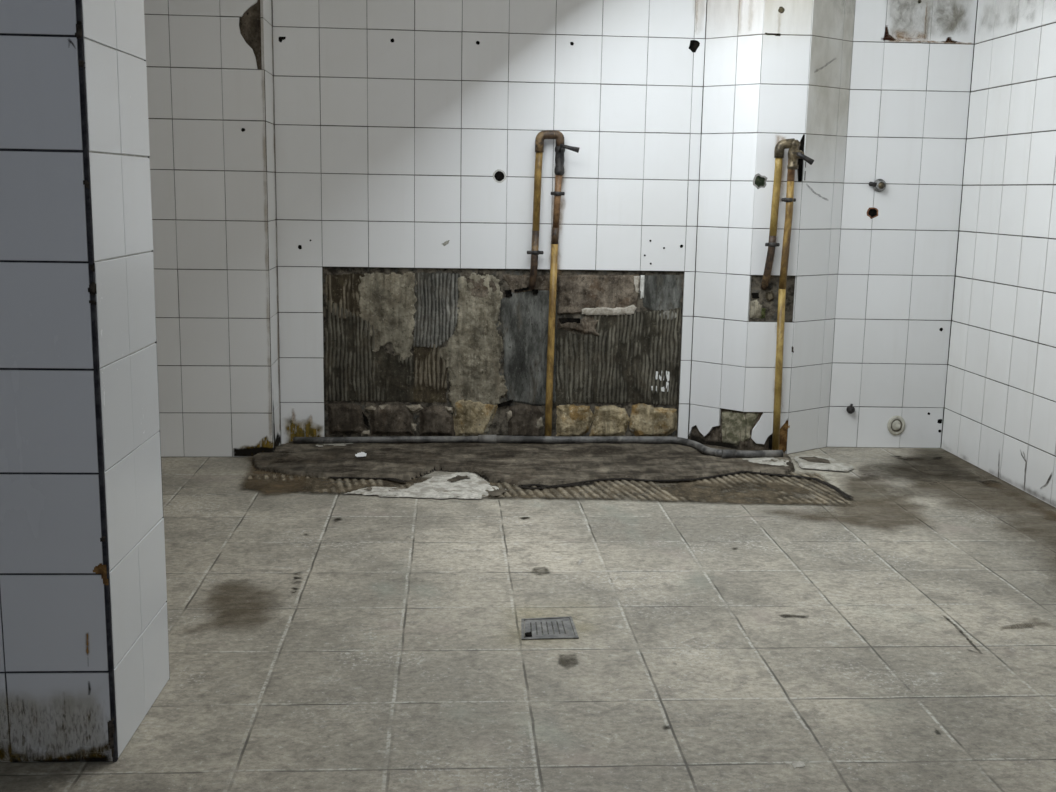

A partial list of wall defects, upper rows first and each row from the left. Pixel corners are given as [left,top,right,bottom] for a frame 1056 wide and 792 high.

spalling [239,0,264,70]
peeling [322,267,795,453]